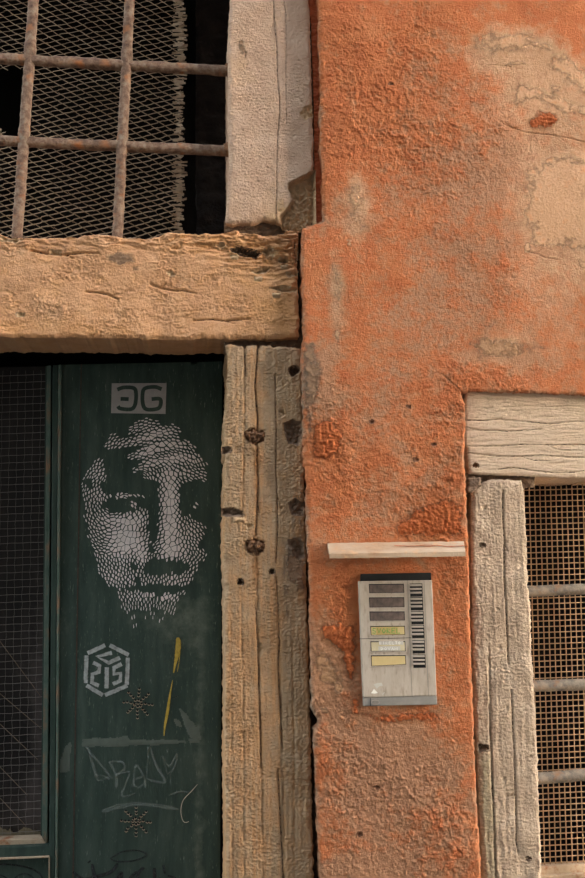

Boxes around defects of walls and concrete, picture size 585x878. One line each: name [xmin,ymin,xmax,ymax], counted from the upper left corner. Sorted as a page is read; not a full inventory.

spalling [277,0,322,233]
spalling [214,242,298,298]